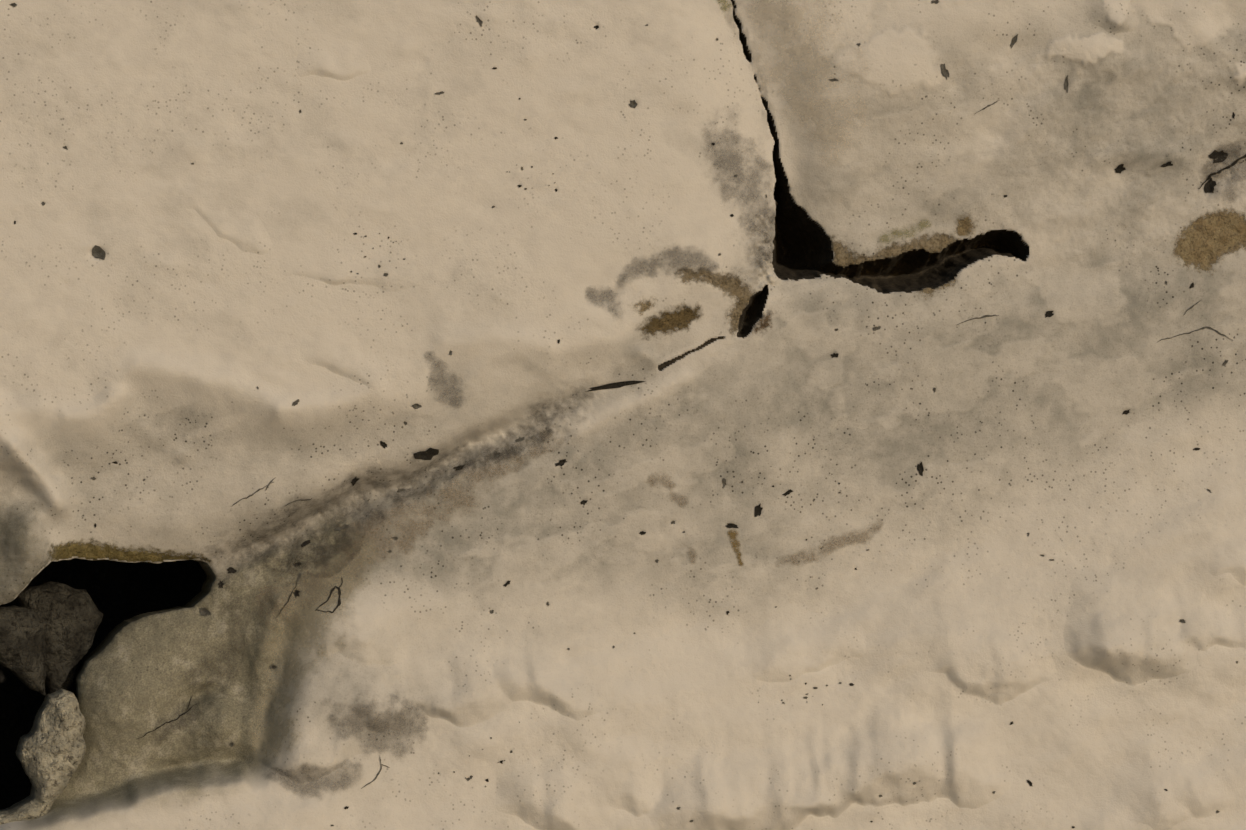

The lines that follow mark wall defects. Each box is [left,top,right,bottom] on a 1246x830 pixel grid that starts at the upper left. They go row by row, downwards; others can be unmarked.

crack [730,0,777,140]
spalling [1174,210,1246,271]
spalling [635,301,700,335]
spalling [676,268,771,338]
crack [957,315,999,325]
crack [658,336,724,371]
spalling [49,523,211,564]